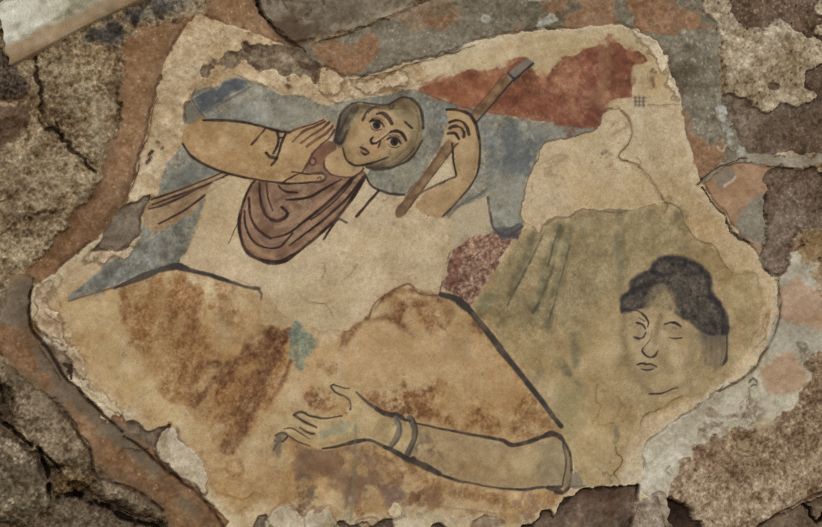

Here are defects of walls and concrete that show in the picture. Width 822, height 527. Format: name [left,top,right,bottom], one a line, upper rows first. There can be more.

spalling [730,0,822,41]
peeling [357,72,408,95]
crack [32,55,97,174]
spalling [722,64,822,156]
peeling [35,283,208,494]
spalling [666,497,703,527]
crack [756,490,822,527]